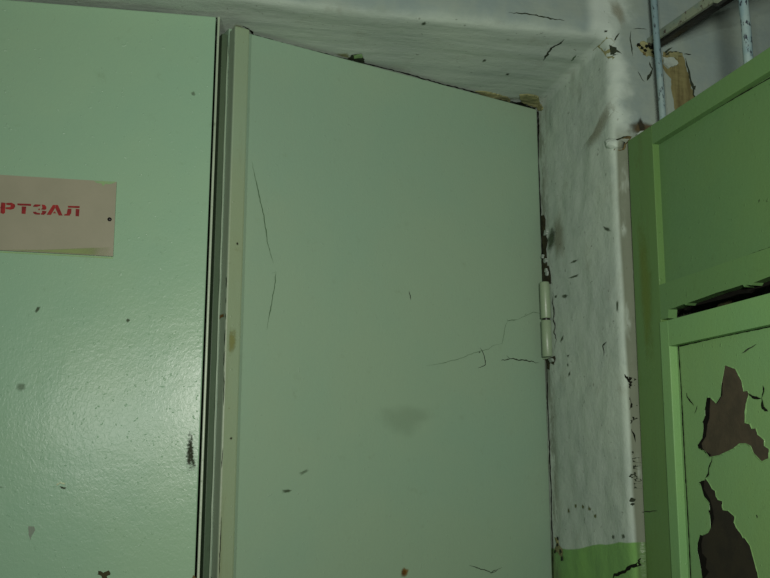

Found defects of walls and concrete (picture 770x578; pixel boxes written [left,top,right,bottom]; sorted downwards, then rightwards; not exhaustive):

crack [508,12,564,21]
flaking render [475,91,543,111]
flaking render [636,41,696,110]
crack [434,312,553,573]
peeling [698,365,770,463]
peeling [697,478,759,578]
crack [613,558,645,578]